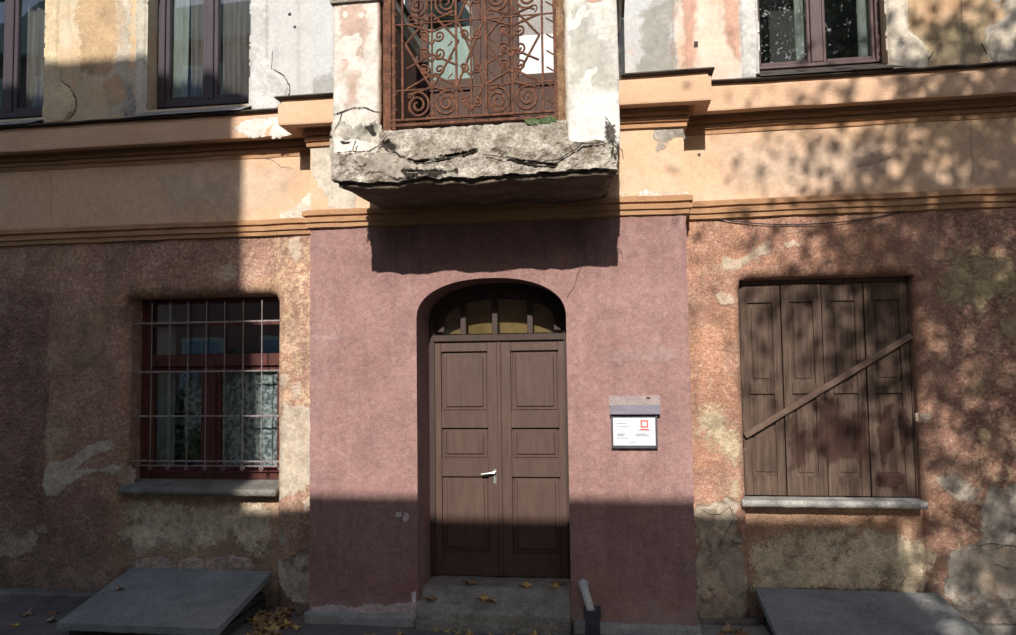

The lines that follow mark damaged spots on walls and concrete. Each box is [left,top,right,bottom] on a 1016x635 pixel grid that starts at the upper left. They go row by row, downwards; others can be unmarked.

peeling [74,0,136,116]
peeling [235,117,291,139]
crack [333,107,404,158]
crack [480,117,623,165]
flaking render [604,121,617,140]
flaking render [42,374,420,615]
flaking render [692,397,1016,625]